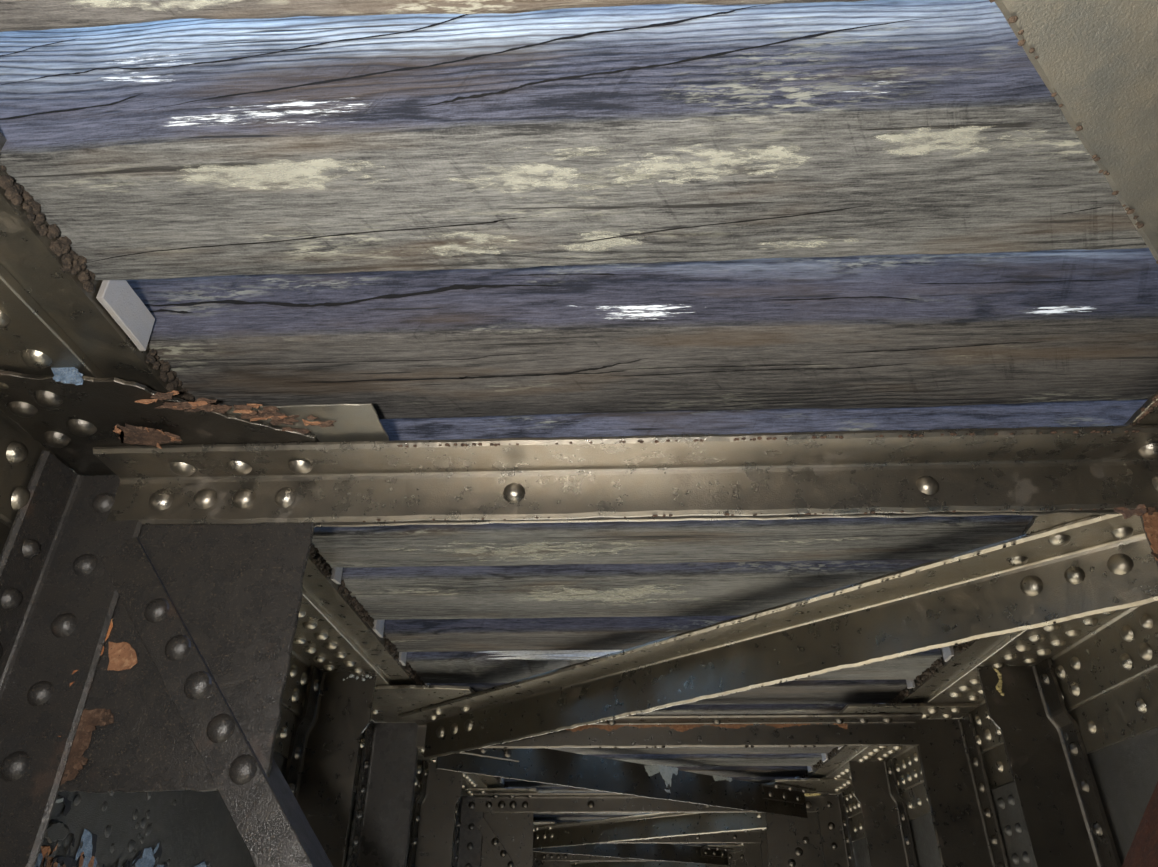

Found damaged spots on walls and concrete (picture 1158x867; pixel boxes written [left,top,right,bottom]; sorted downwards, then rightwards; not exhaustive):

corrosion [113,423,182,449]
corrosion [135,390,336,434]
corrosion [1071,504,1158,561]
corrosion [101,619,138,671]
peeling [35,792,170,867]